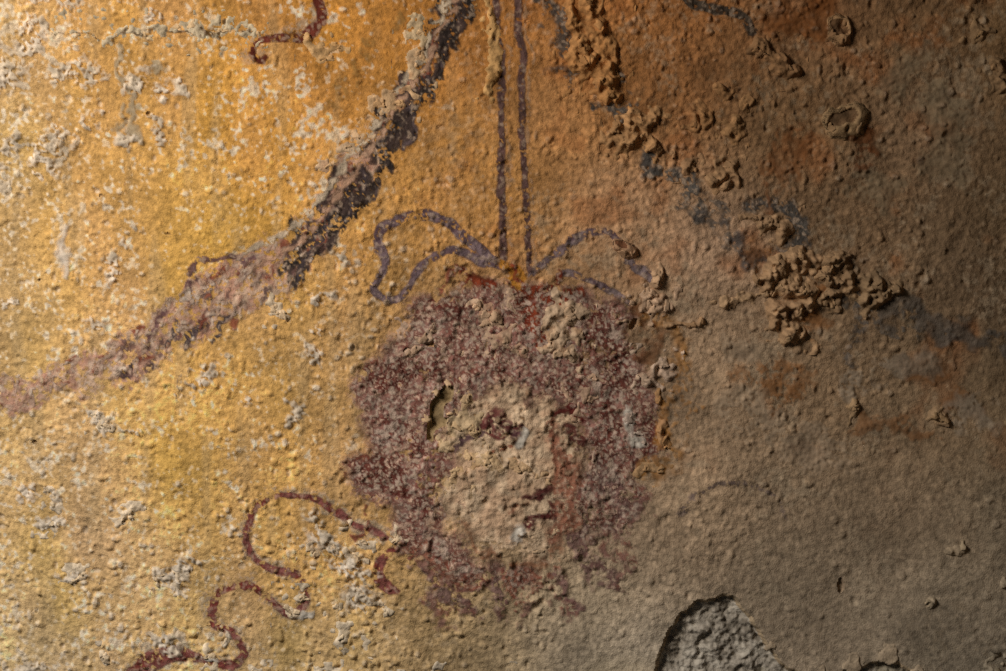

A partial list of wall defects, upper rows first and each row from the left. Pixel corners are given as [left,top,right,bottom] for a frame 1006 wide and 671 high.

peeling [421,374,458,442]
spalling [654,593,797,671]
spalling [842,643,924,671]